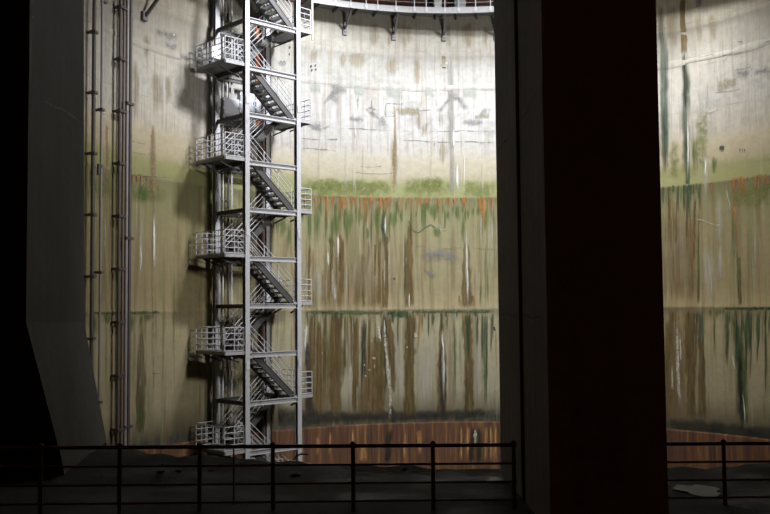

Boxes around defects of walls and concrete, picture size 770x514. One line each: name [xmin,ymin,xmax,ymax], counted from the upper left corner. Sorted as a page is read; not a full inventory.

damp [659,29,668,163]
damp [279,222,485,423]
damp [665,313,770,438]